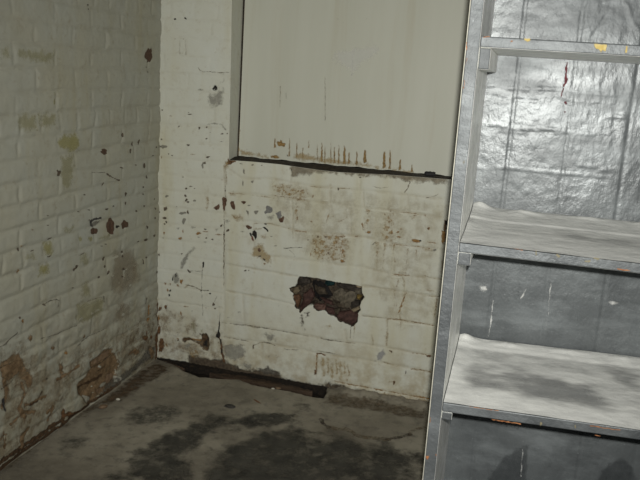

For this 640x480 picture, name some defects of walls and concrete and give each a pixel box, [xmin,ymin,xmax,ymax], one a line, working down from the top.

corrosion [271,140,367,165]
spalling [289,277,364,327]
spalling [177,333,210,351]
peeling [0,354,47,425]
spalling [77,349,122,404]
damp [108,413,424,480]